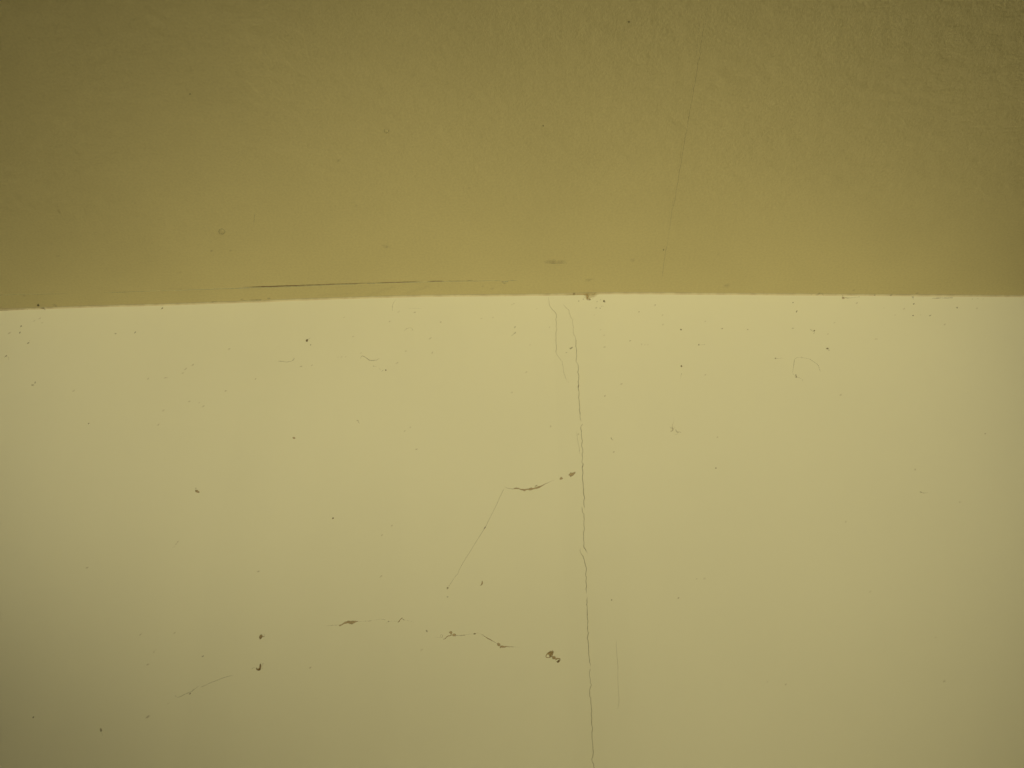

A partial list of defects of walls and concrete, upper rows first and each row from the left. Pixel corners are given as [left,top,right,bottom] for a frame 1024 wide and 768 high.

crack [198,281,452,290]
crack [514,348,587,588]